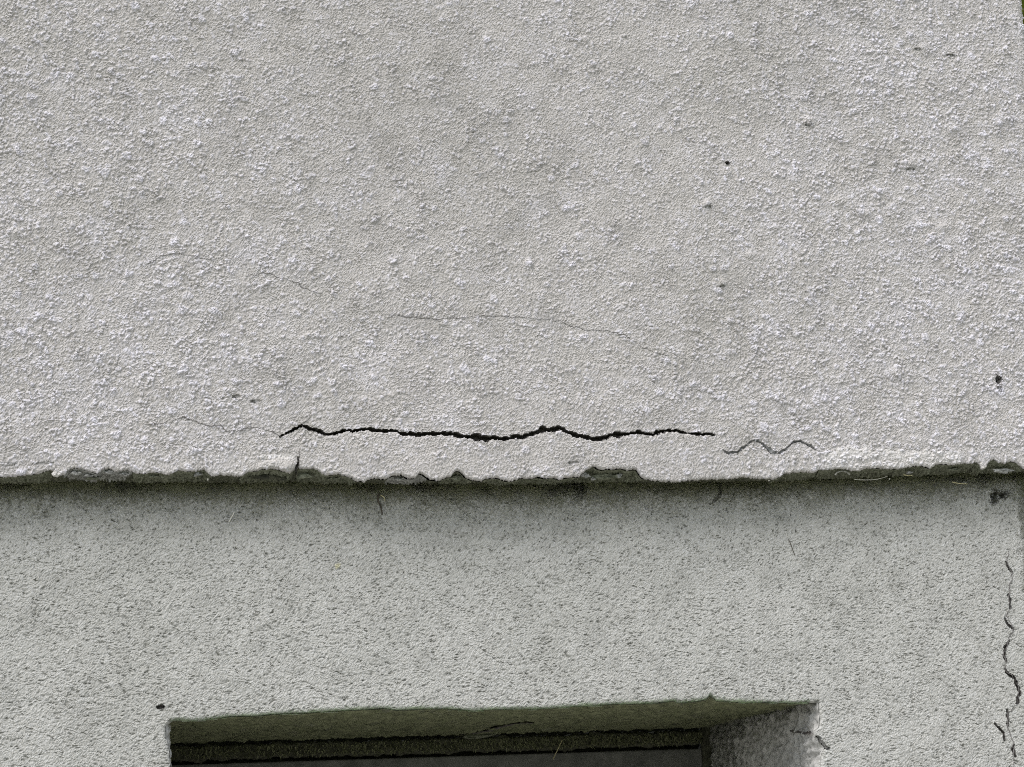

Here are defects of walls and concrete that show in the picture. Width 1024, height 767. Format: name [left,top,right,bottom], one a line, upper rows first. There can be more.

crack [143,416,814,475]
crack [994,551,1021,764]